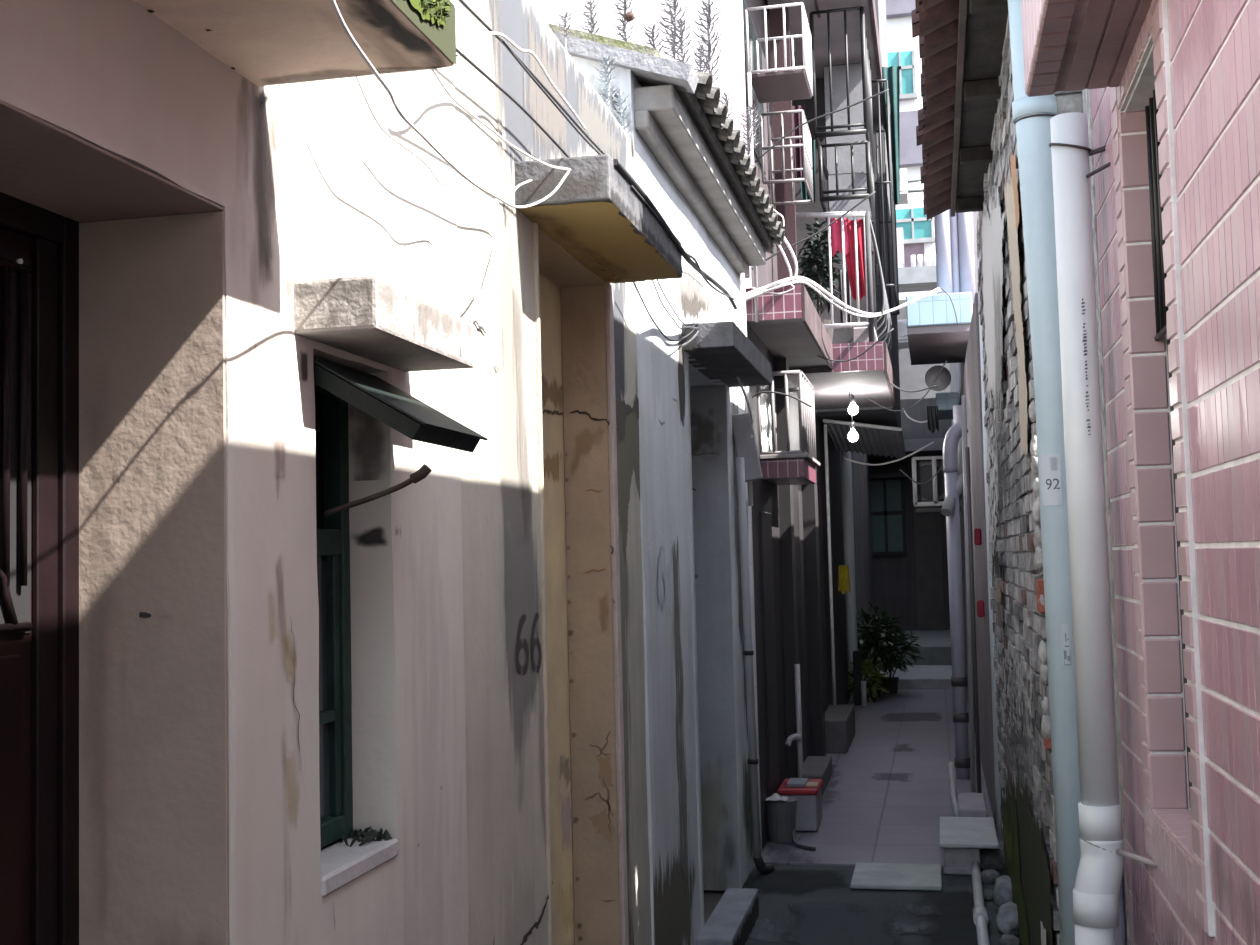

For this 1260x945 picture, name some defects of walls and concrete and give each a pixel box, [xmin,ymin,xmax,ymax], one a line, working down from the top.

water stain [255,0,443,276]
crack [542,409,609,426]
water stain [489,0,716,746]
crack [493,882,553,945]
crack [585,731,614,832]
water stain [654,541,695,945]